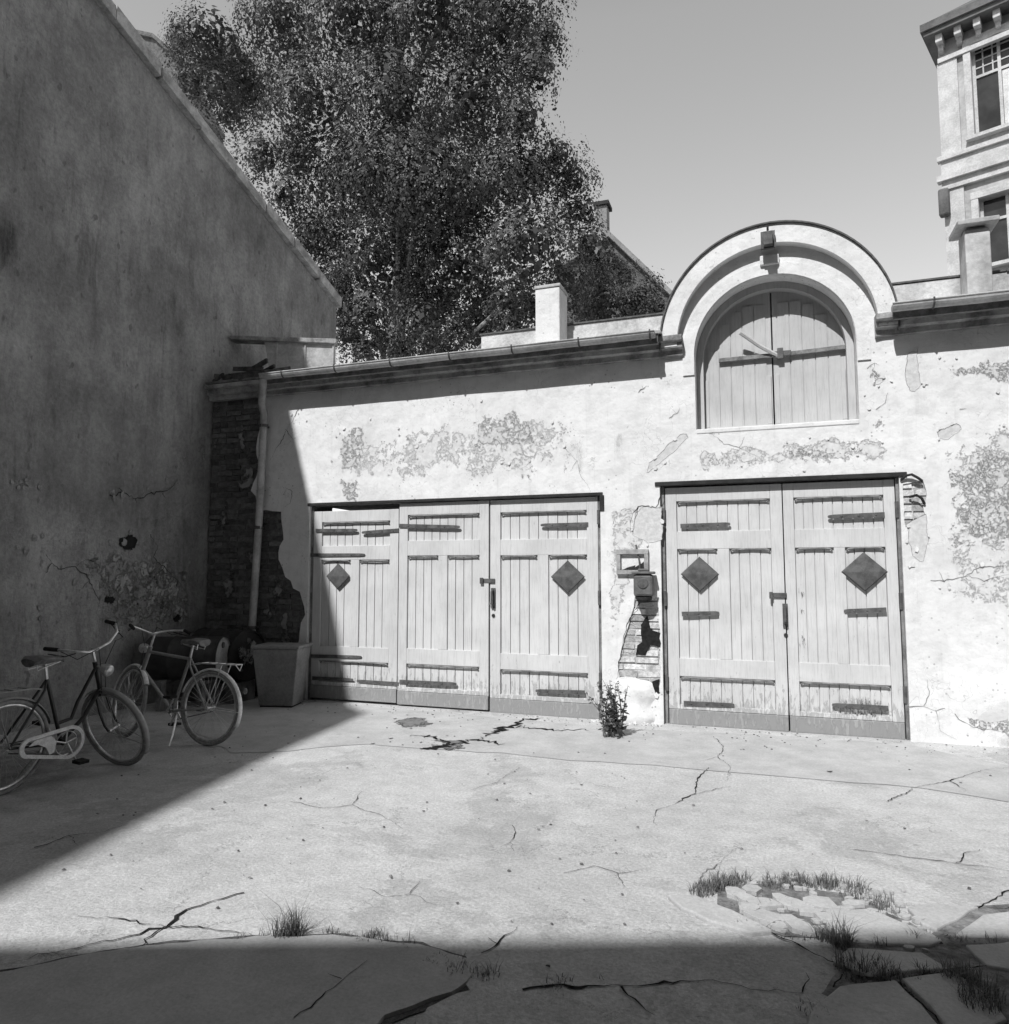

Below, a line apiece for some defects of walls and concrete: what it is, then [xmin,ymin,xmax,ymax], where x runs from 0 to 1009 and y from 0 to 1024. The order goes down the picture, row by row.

spalling [864,348,926,410]
peeling [330,410,584,501]
spalling [647,434,688,472]
peeling [700,421,887,472]
flaking render [206,398,305,643]
peeling [898,422,1009,608]
flaking render [609,504,664,697]
crack [410,718,586,749]
crack [653,736,731,825]
crack [856,849,1009,909]
crack [0,892,252,965]
crack [522,932,987,1024]